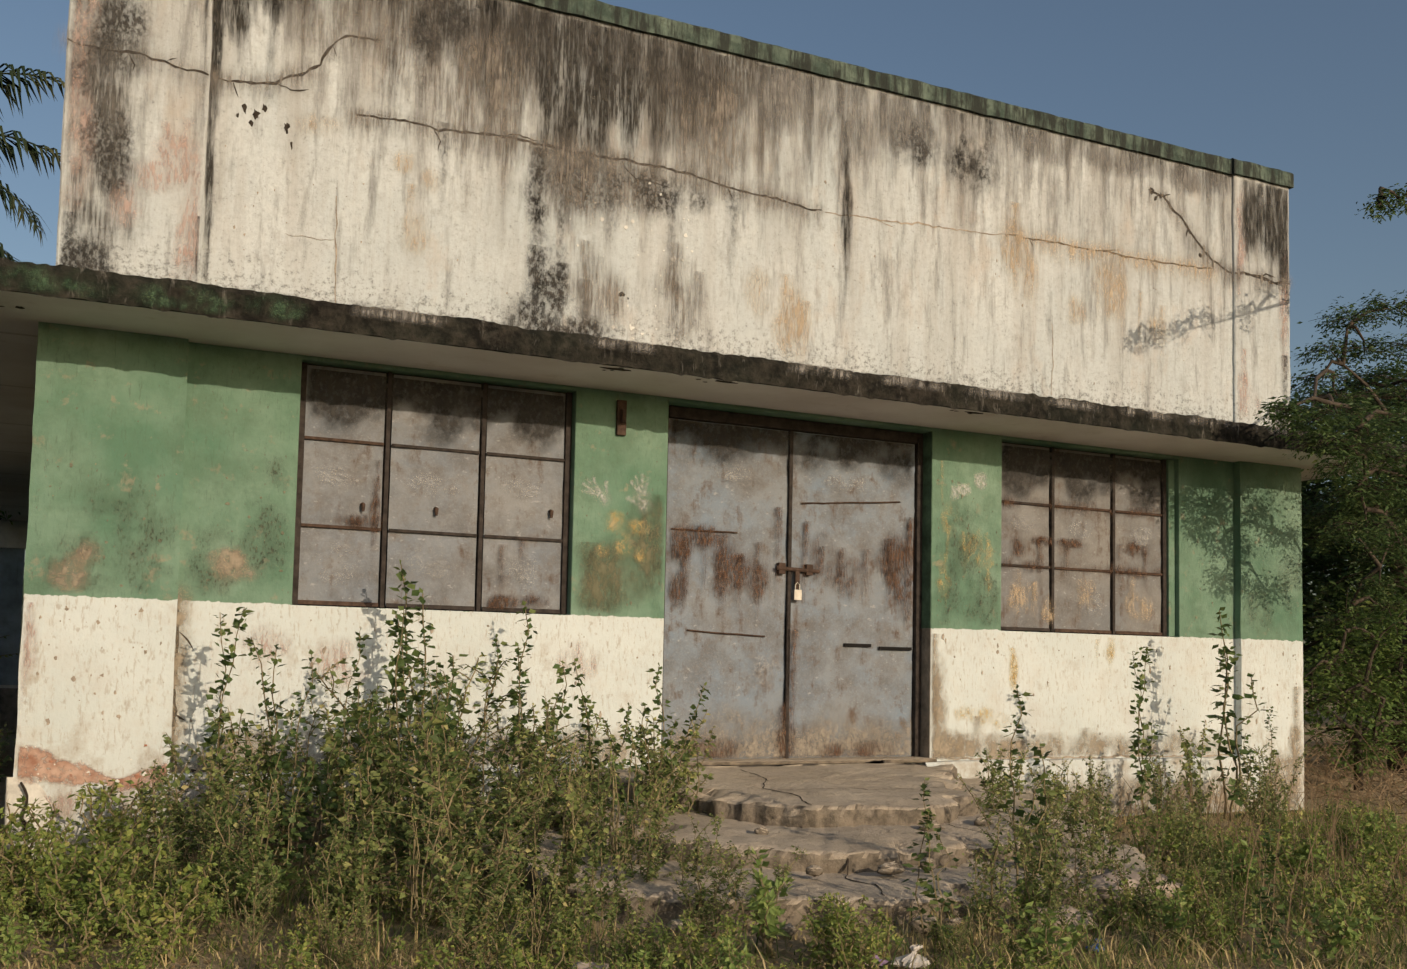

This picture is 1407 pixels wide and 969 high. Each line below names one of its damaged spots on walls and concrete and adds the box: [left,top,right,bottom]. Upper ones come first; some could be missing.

leakage [71,0,146,196]
leakage [195,145,214,268]
crack [68,35,380,96]
leakage [205,0,284,96]
leakage [318,0,739,223]
crack [350,110,1290,287]
leakage [758,64,962,250]
leakage [1243,182,1288,281]
leakage [508,242,653,352]
corrosion [670,525,769,605]
corrosion [802,517,914,606]
flaking render [18,746,167,817]